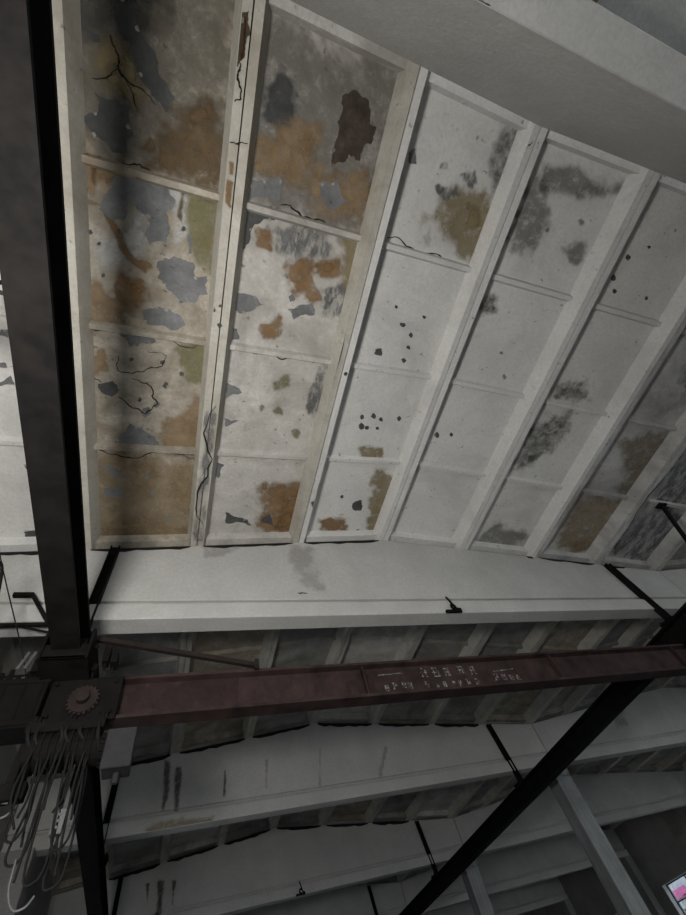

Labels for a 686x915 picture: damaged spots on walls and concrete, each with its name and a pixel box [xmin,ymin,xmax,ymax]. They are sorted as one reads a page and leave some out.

spalling [237,10,250,66]
peeling [84,92,134,154]
spalling [331,90,376,167]
water stain [491,132,516,184]
peeling [99,175,208,330]
peeling [243,207,330,257]
water stain [435,192,490,258]
peeling [288,285,346,319]
peeling [0,362,15,386]
crack [95,336,197,415]
water stain [619,433,667,492]
water stain [559,496,619,553]